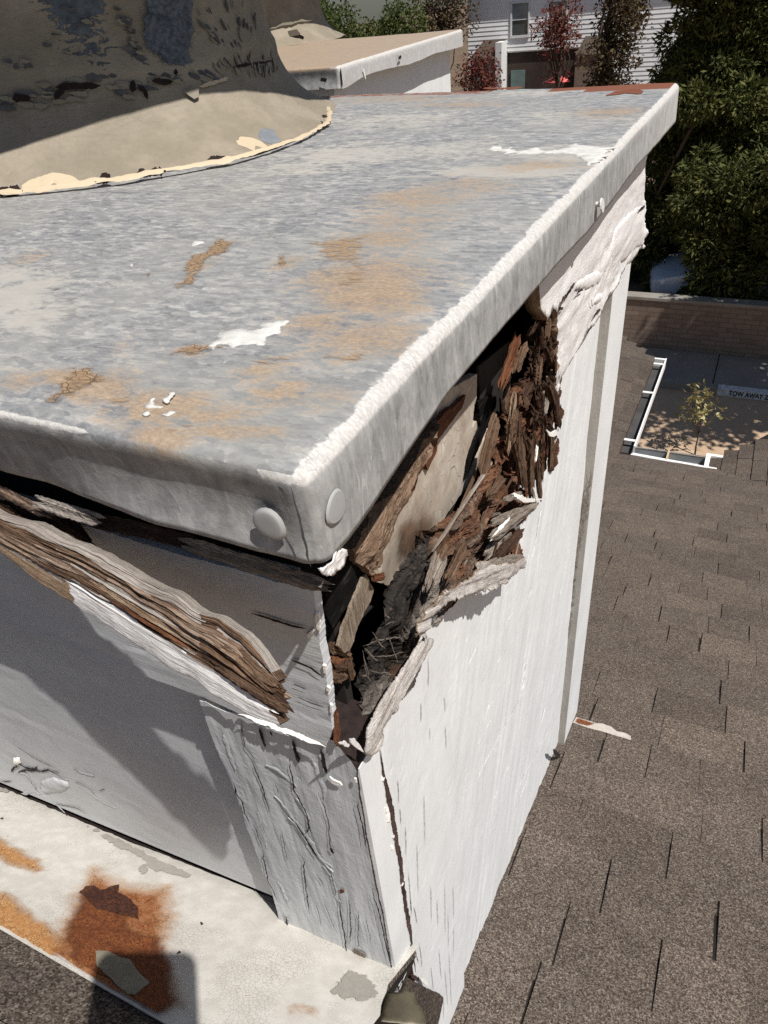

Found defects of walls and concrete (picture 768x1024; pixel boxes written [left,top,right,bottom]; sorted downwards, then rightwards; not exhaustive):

peeling [21,173,94,189]
peeling [236,128,281,151]
peeling [200,557,527,755]
corrosion [0,840,41,871]
crack [0,723,420,981]
corrosion [0,875,181,1013]